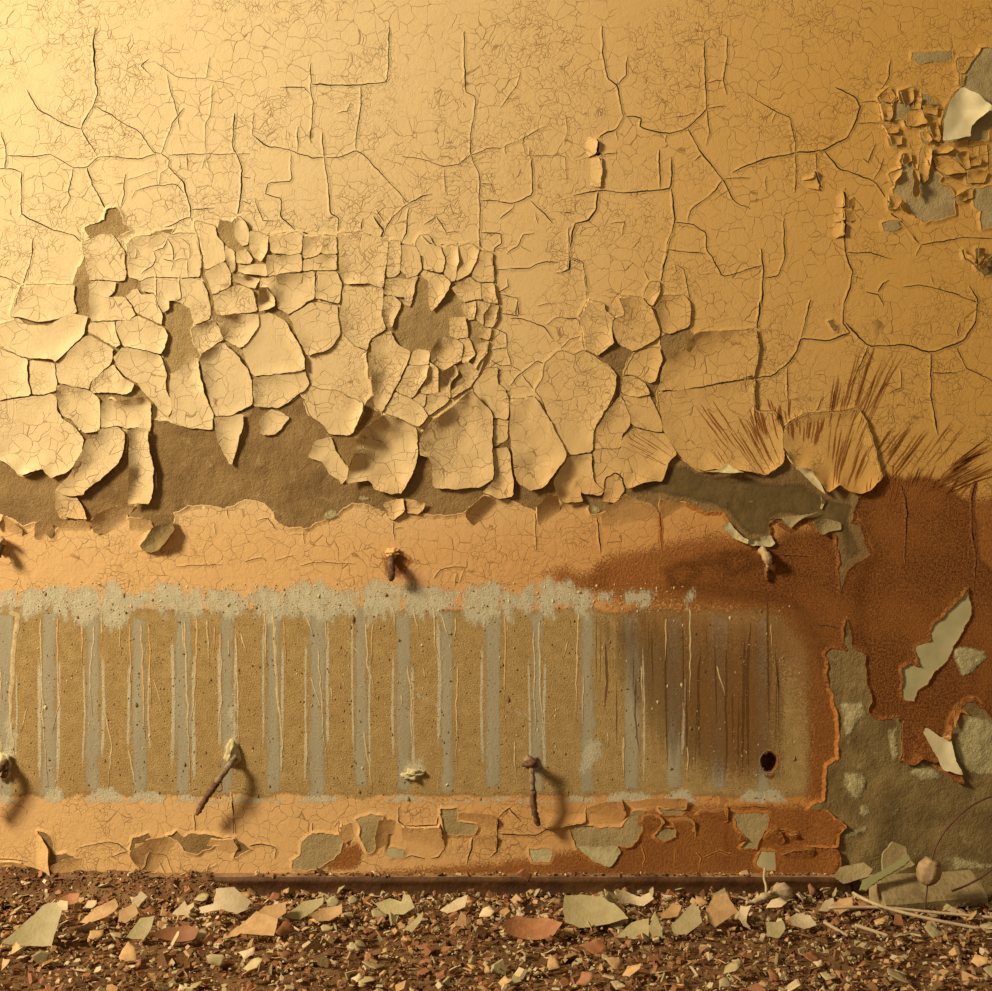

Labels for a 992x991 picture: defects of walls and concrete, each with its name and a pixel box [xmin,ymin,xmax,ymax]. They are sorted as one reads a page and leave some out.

crack [0,26,992,434]
peeling [874,43,992,281]
peeling [0,204,886,595]
peeling [127,827,255,872]
crack [176,516,356,569]
peeling [288,804,498,873]
damp [0,570,813,806]
crack [433,564,465,586]
crack [578,516,604,553]
crack [656,512,664,549]
rust [375,341,992,874]
flaking render [545,586,992,940]